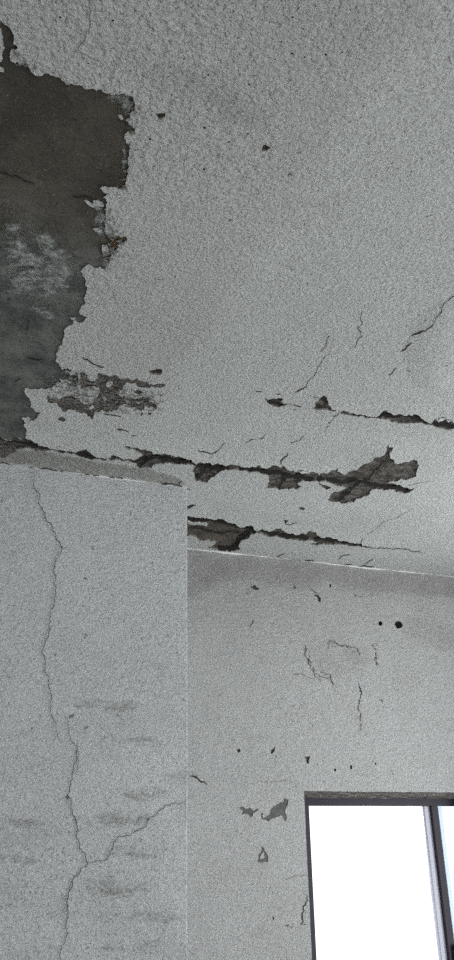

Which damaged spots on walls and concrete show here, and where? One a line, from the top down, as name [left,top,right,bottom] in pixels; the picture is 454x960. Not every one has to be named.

peeling [0,21,166,441]
crack [391,296,454,375]
crack [255,336,330,398]
flaking render [265,398,301,408]
flaking render [313,395,336,411]
crack [0,414,429,960]
peeling [240,798,288,822]
peeling [257,847,269,863]